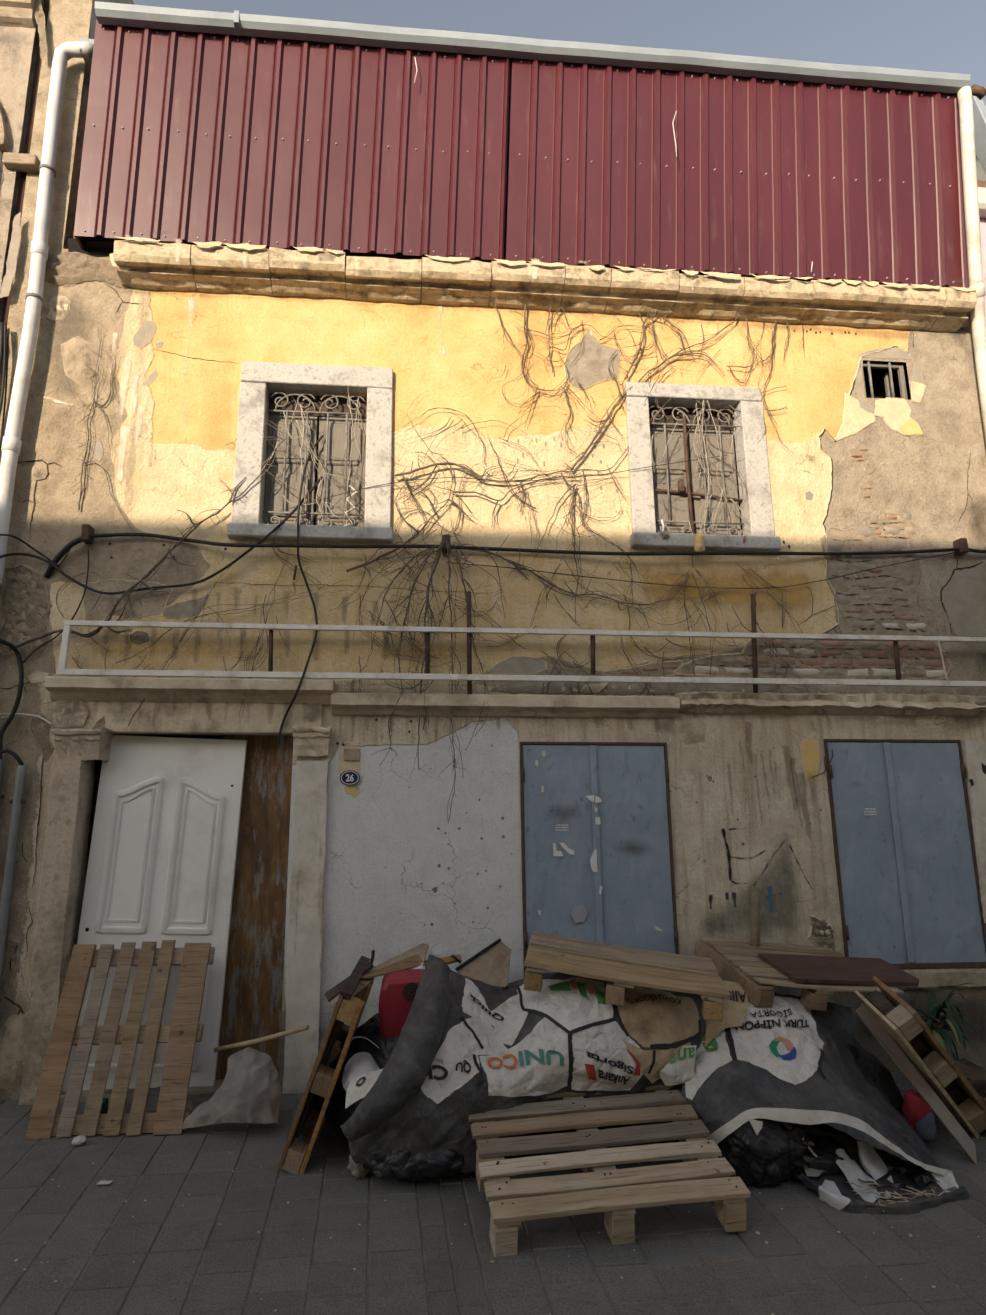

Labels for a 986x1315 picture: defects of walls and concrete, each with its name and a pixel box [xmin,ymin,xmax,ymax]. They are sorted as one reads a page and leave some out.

peeling [46,284,76,322]
peeling [133,320,164,349]
peeling [563,327,622,390]
peeling [92,440,104,461]
flaking render [488,347,952,696]
peeling [83,579,210,646]